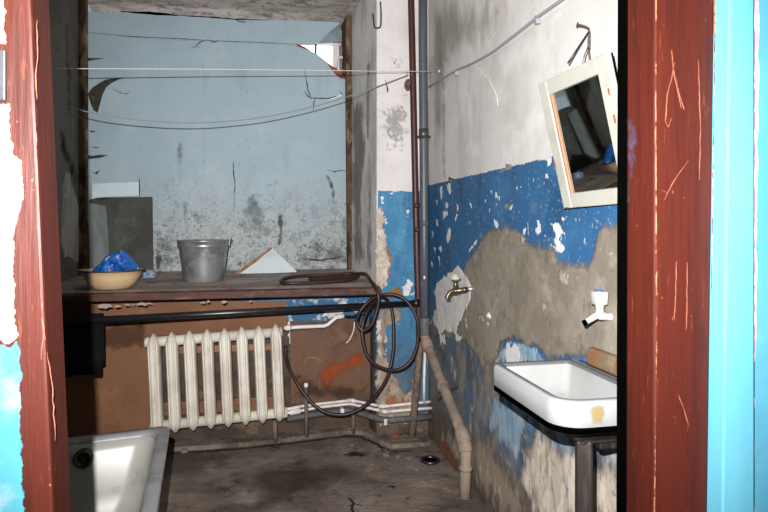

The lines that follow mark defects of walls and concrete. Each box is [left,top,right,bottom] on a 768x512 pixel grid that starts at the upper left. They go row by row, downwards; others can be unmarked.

crack [304,71,342,111]
flaking render [375,192,399,289]
peeling [402,279,415,296]
flaking render [430,183,617,367]
flaking render [441,428,460,462]
flaking render [471,397,575,512]
flaking render [593,434,617,512]